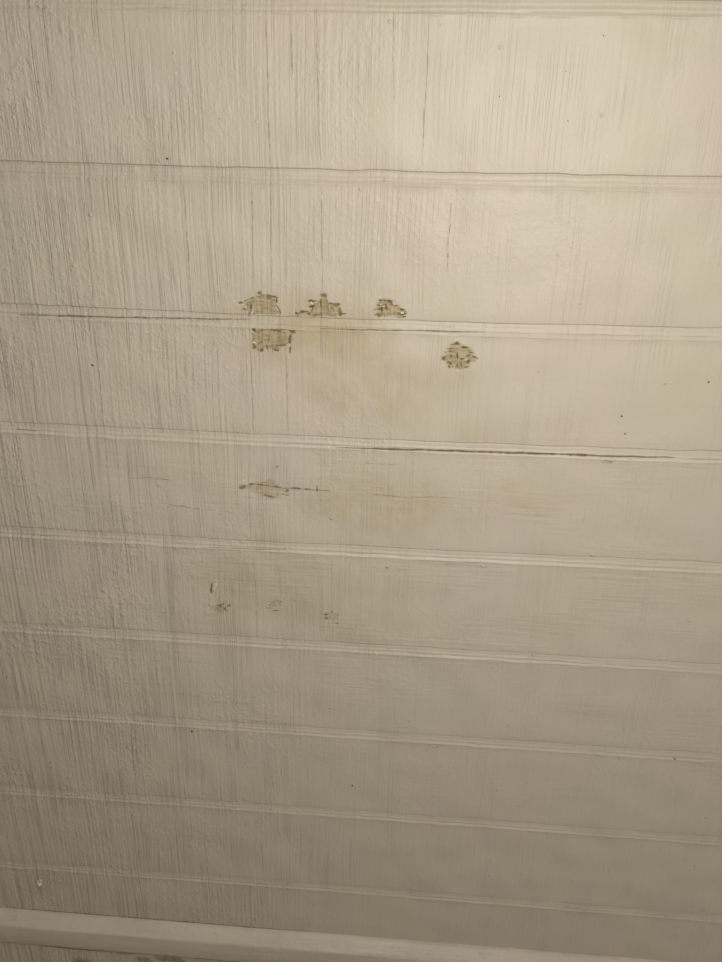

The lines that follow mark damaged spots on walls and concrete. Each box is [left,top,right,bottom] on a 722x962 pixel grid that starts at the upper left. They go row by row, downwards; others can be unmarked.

peeling [239,292,283,316]
peeling [295,292,346,318]
peeling [372,297,408,319]
peeling [249,328,298,355]
peeling [441,342,479,371]
crack [339,447,675,458]
peeling [238,479,318,500]